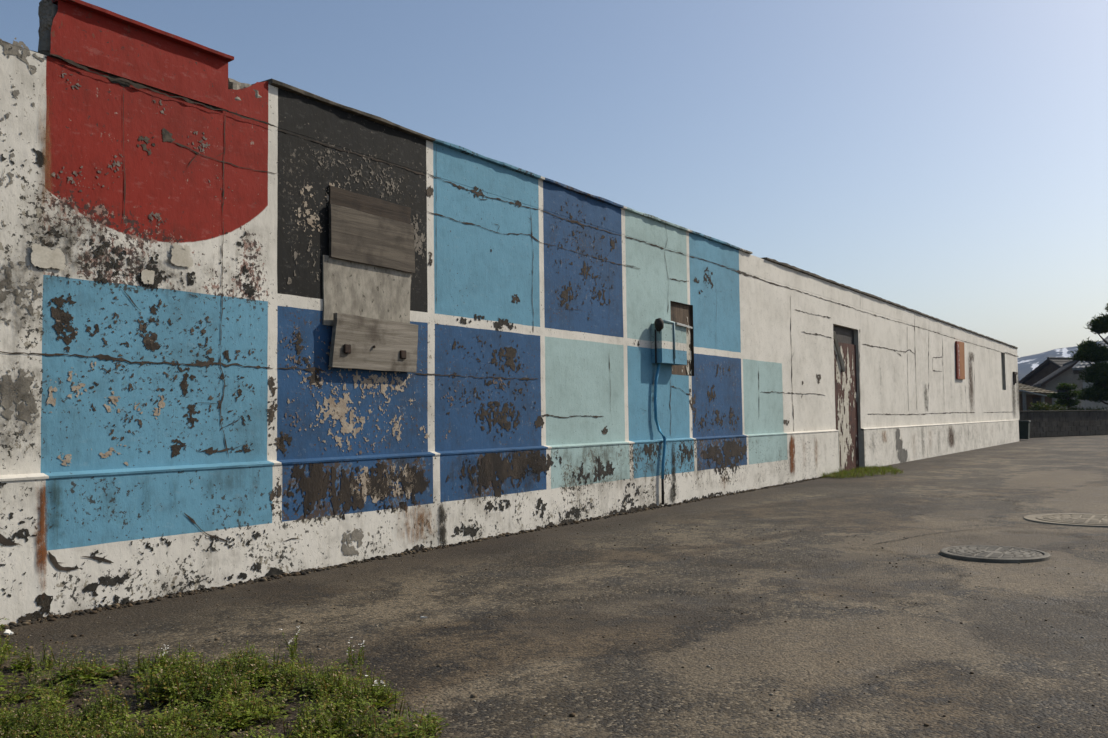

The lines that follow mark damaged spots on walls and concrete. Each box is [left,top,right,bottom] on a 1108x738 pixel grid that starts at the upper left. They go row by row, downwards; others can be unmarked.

peeling [0,153,27,196]
peeling [0,85,36,141]
corrosion [37,486,47,587]
peeling [0,242,256,466]
crack [0,53,324,458]
peeling [267,327,430,561]
peeling [284,147,434,284]
peeling [438,334,551,497]
spalling [598,503,667,517]
peeling [671,317,692,375]
crack [415,149,1019,420]
peeling [689,364,748,474]